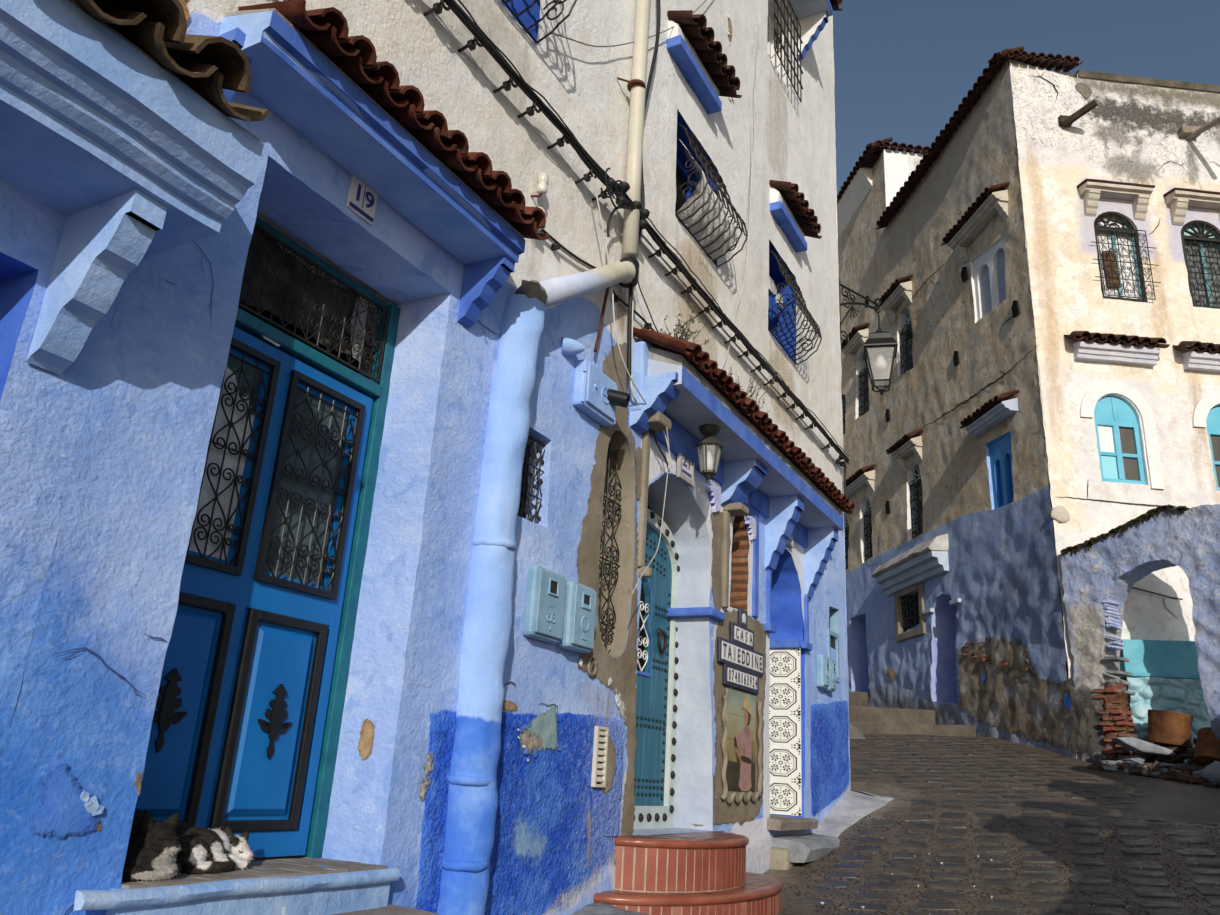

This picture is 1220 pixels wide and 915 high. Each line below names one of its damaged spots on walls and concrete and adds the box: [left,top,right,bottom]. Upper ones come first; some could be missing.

leakage [1078,79,1220,183]
crack [51,647,145,698]
peeling [358,719,375,760]
peeling [518,705,562,761]
spalling [957,635,1129,760]
peeling [29,764,104,839]